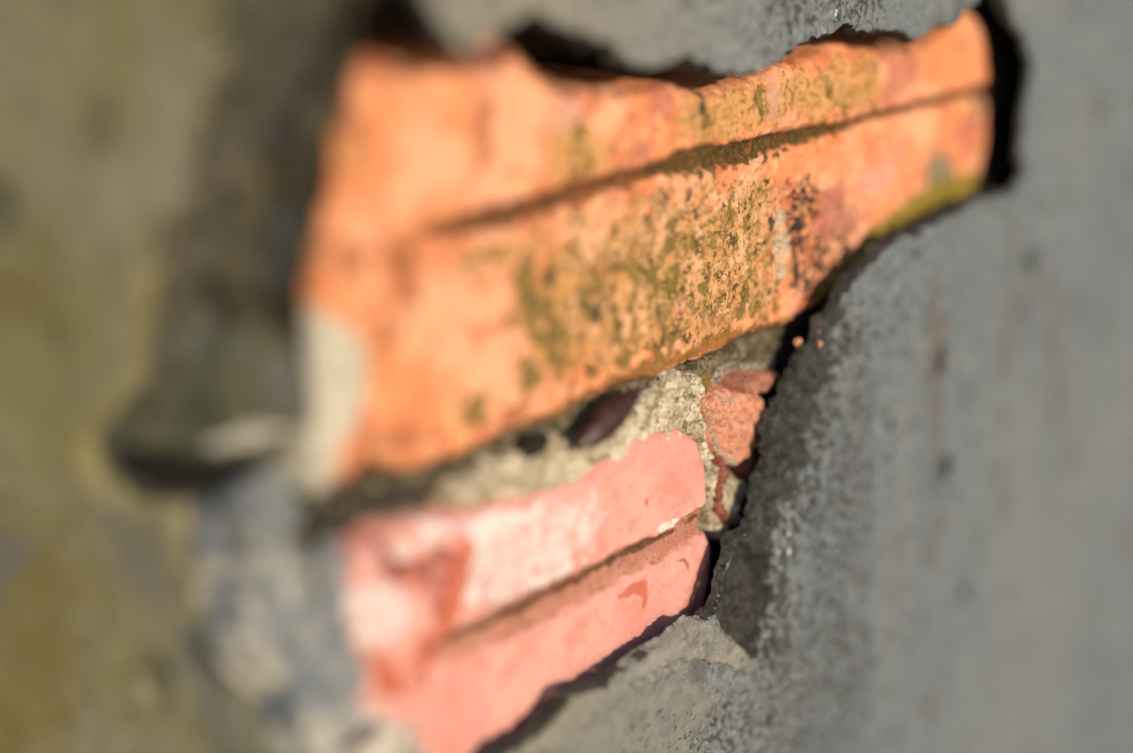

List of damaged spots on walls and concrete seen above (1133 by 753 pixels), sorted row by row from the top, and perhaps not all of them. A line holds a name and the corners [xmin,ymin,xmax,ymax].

water stain [385,229,421,304]
spalling [99,0,960,432]
water stain [591,303,601,325]
water stain [470,316,789,448]
spalling [485,0,1034,753]
water stain [768,174,857,300]
spalling [95,445,215,515]